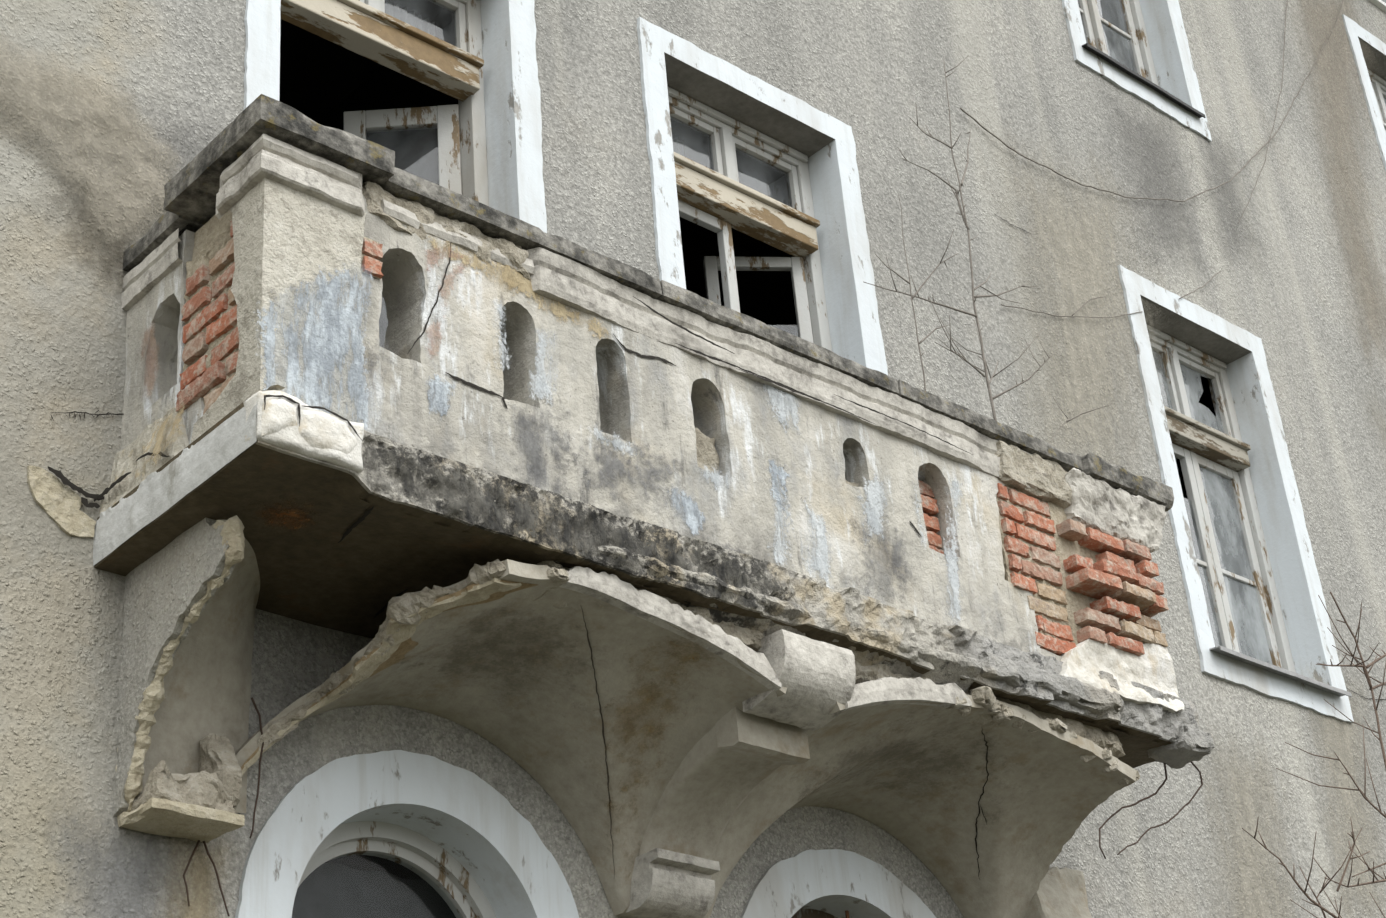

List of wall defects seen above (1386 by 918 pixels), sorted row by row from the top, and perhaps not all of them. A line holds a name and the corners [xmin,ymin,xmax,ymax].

spalling [145,221,239,466]
crack [407,242,452,354]
crack [445,372,507,408]
spalling [27,465,105,538]
peeling [666,488,705,535]
peeling [699,467,728,490]
spalling [915,480,962,620]
spalling [996,483,1169,656]
spalling [115,515,245,812]
crack [581,607,614,863]
crack [975,729,989,879]